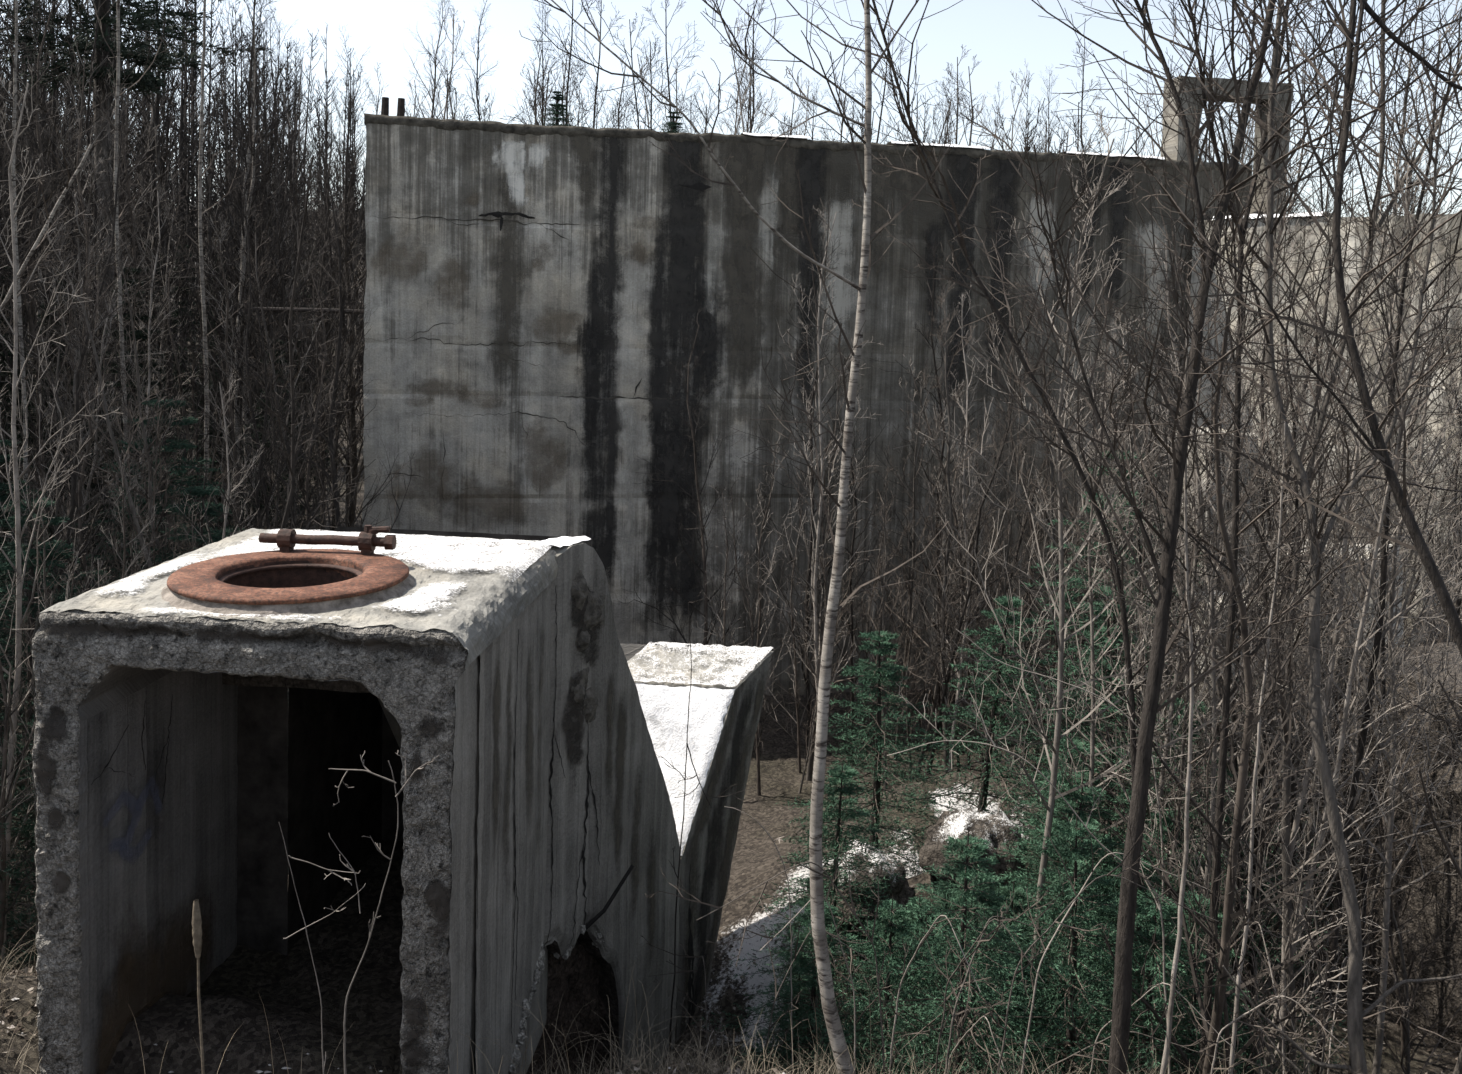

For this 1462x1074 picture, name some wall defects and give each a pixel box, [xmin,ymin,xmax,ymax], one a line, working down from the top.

leakage [422,175,528,407]
crack [369,216,598,241]
leakage [569,135,857,623]
leakage [870,151,1055,399]
leakage [563,588,600,776]
crack [472,665,480,1058]
crack [511,587,600,1034]
spalling [508,925,604,1074]